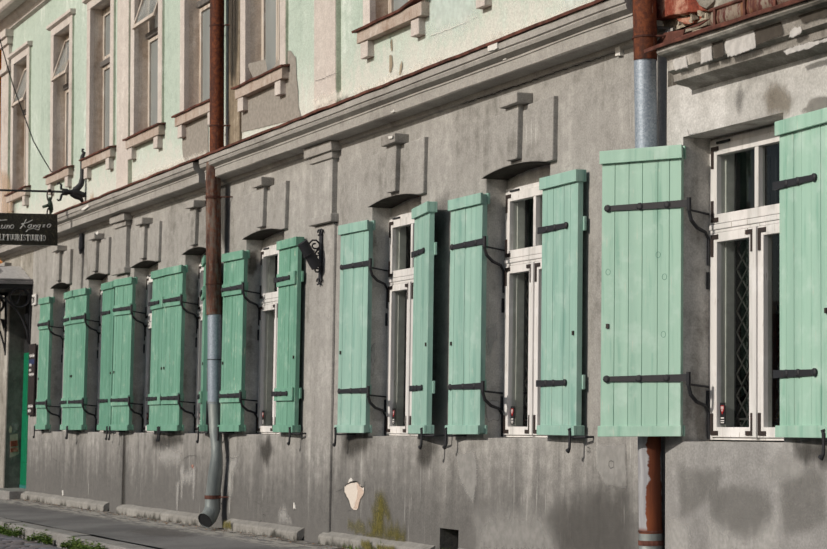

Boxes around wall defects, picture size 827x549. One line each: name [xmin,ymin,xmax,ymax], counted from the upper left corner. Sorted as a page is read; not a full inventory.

corrosion [633,0,657,61]
peeling [673,56,687,70]
peeling [701,44,712,63]
peeling [725,30,756,56]
peeling [784,26,827,55]
water stain [804,97,827,112]
flaking render [336,478,365,511]